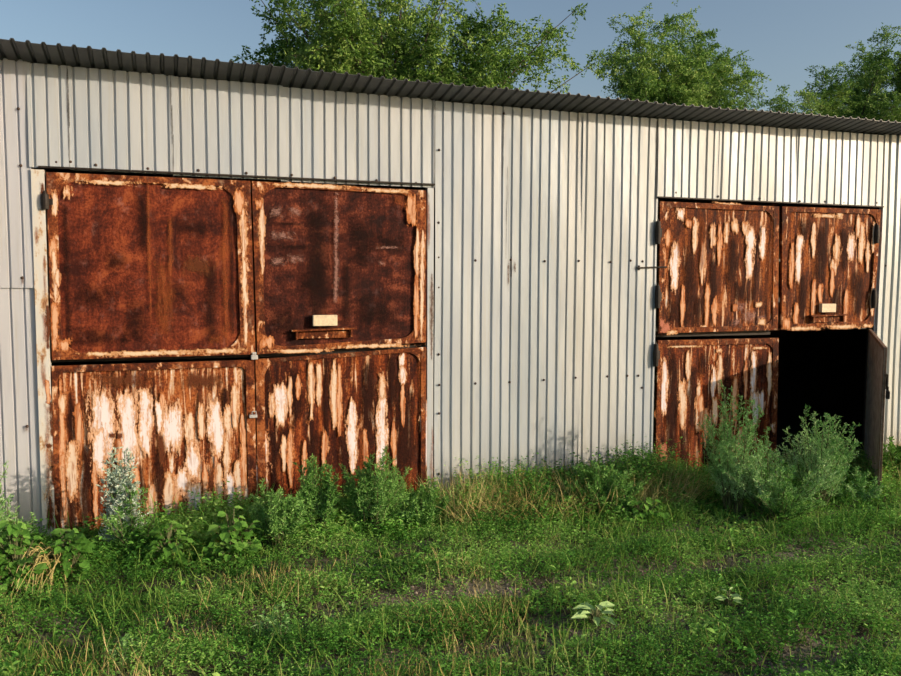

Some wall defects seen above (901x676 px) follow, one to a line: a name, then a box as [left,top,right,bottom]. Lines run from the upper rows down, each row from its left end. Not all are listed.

rust [665,217,759,326]
peeling [659,207,767,335]
rust [799,218,843,317]
peeling [781,213,876,331]
rust [67,394,93,536]
rust [138,435,166,505]
peeling [49,178,425,526]
rust [271,369,305,494]
rust [307,358,352,496]
rust [388,356,421,487]
rust [665,349,713,467]
peeling [654,345,772,460]